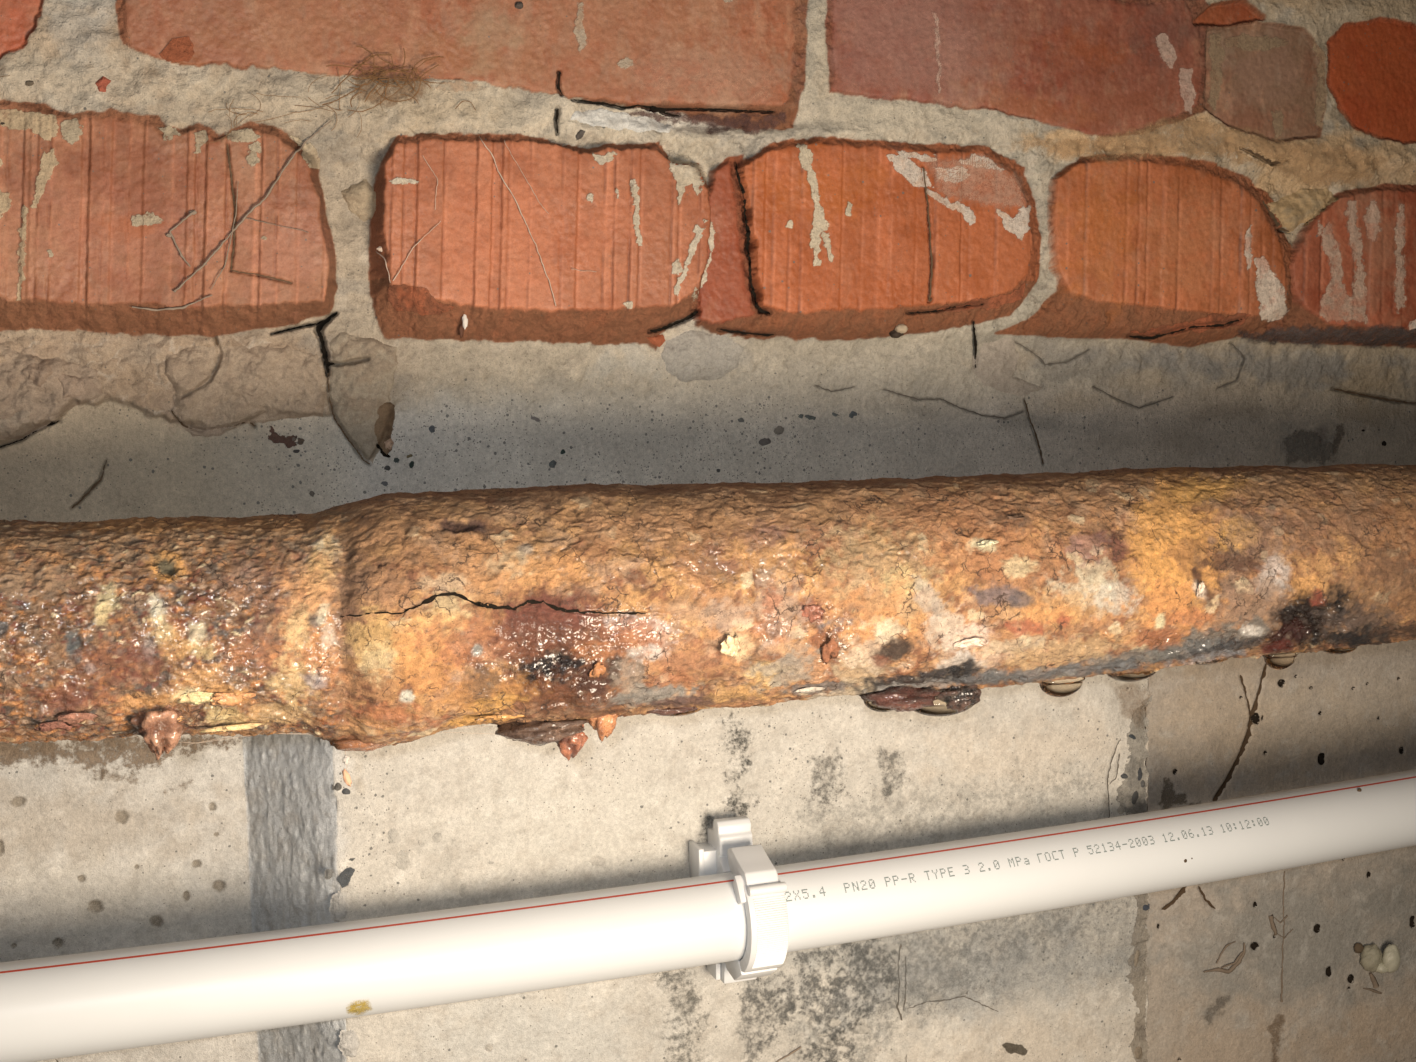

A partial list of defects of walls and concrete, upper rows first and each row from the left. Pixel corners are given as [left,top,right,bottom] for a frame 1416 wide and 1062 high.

crack [650,164,774,337]
spalling [387,284,454,316]
crack [274,313,370,464]
crack [0,421,59,448]
crack [171,410,256,429]
spalling [267,426,304,453]
spalling [759,426,784,446]
spalling [798,411,857,420]
water stain [700,713,758,841]
water stain [661,972,699,1061]
water stain [742,943,896,1062]